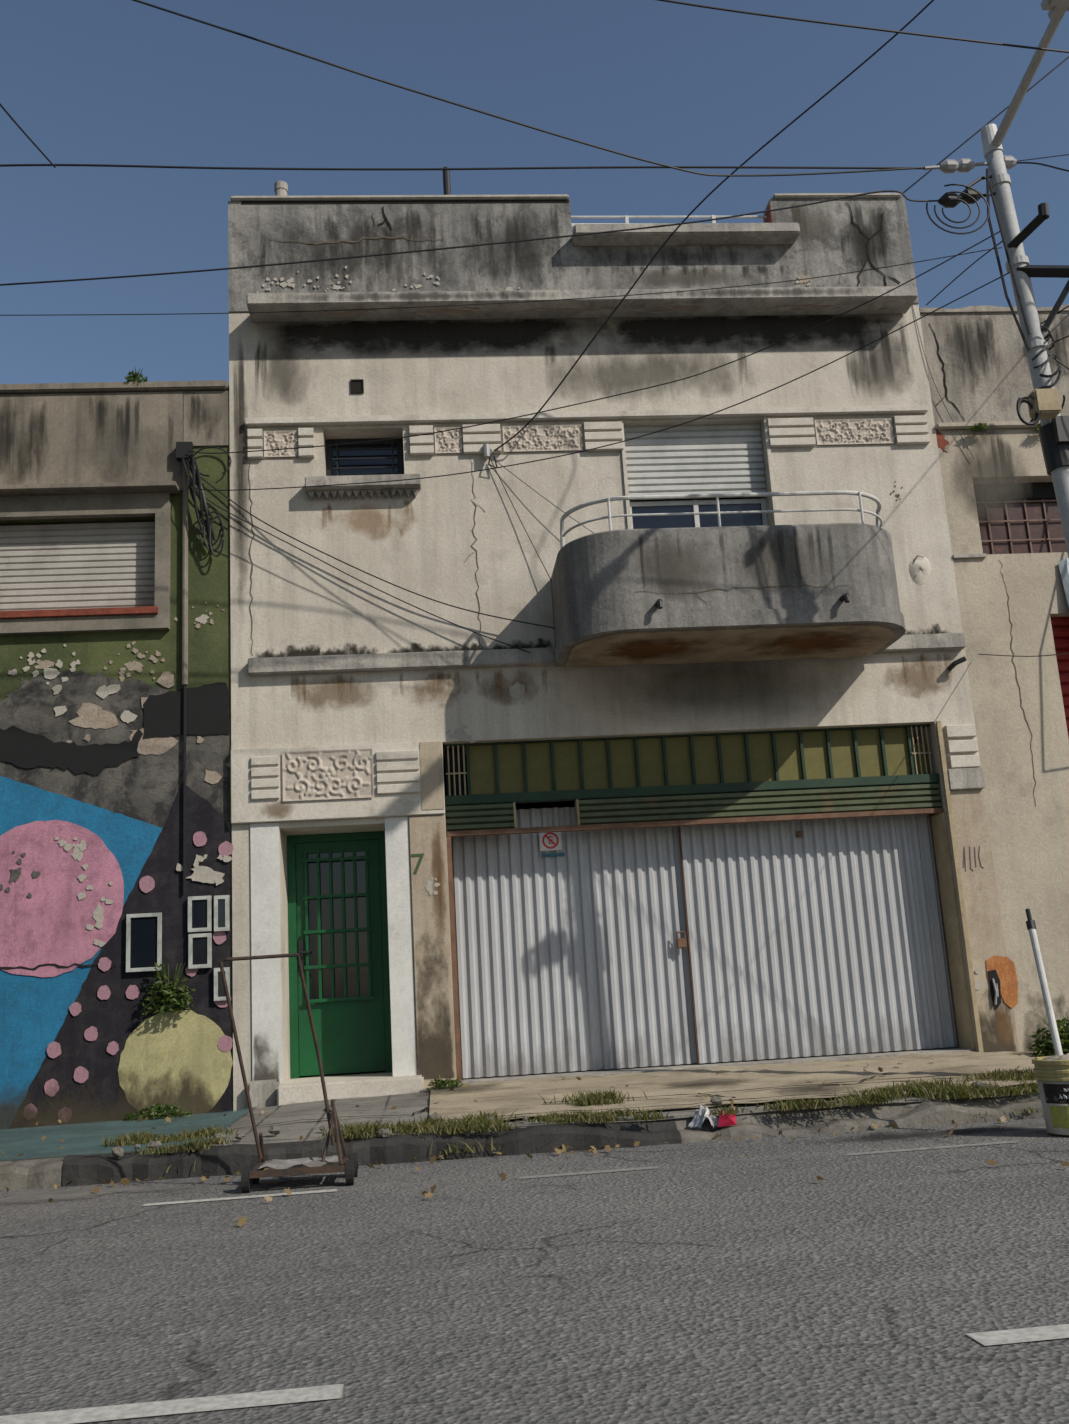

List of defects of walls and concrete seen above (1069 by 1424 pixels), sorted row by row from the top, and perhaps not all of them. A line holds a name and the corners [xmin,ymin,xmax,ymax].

peeling [256,266,352,293]
crack [846,202,901,287]
water stain [571,315,901,393]
crack [464,458,485,648]
water stain [751,541,806,580]
rust [614,639,704,659]
rust [767,633,854,654]
flaking render [0,641,232,907]